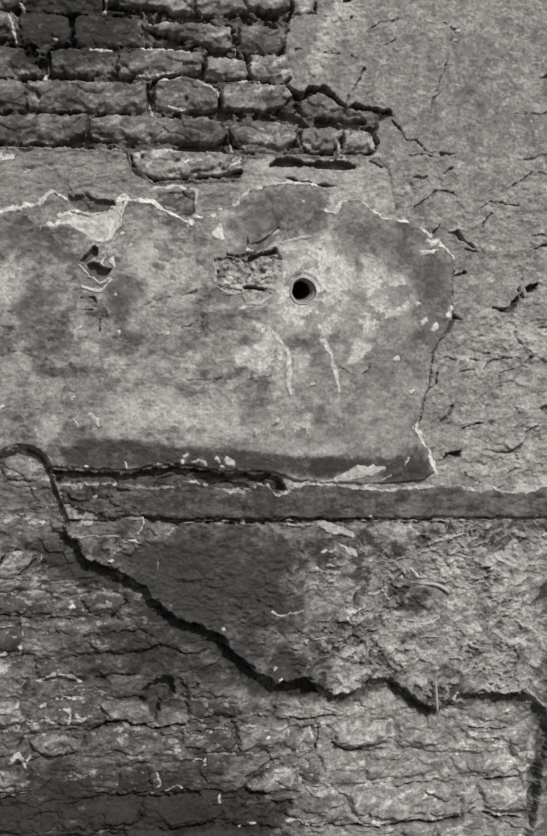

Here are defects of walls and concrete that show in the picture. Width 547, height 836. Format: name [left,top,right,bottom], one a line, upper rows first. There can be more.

spalling [0,0,396,218]
crack [391,120,457,209]
crack [481,154,547,229]
damp [0,254,22,305]
damp [128,233,201,310]
spalling [212,230,313,306]
damp [234,321,310,395]
damp [271,226,411,392]
crack [419,260,535,431]
damp [61,397,430,482]
crack [481,425,540,475]
spalling [0,447,547,836]